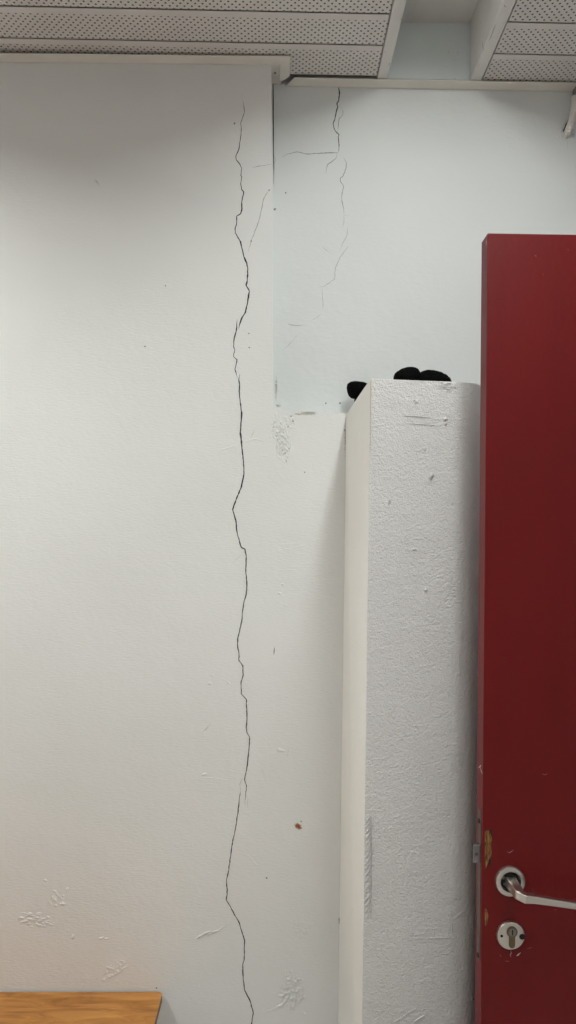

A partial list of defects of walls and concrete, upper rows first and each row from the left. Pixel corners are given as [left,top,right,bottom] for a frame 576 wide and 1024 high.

crack [226,88,348,1024]